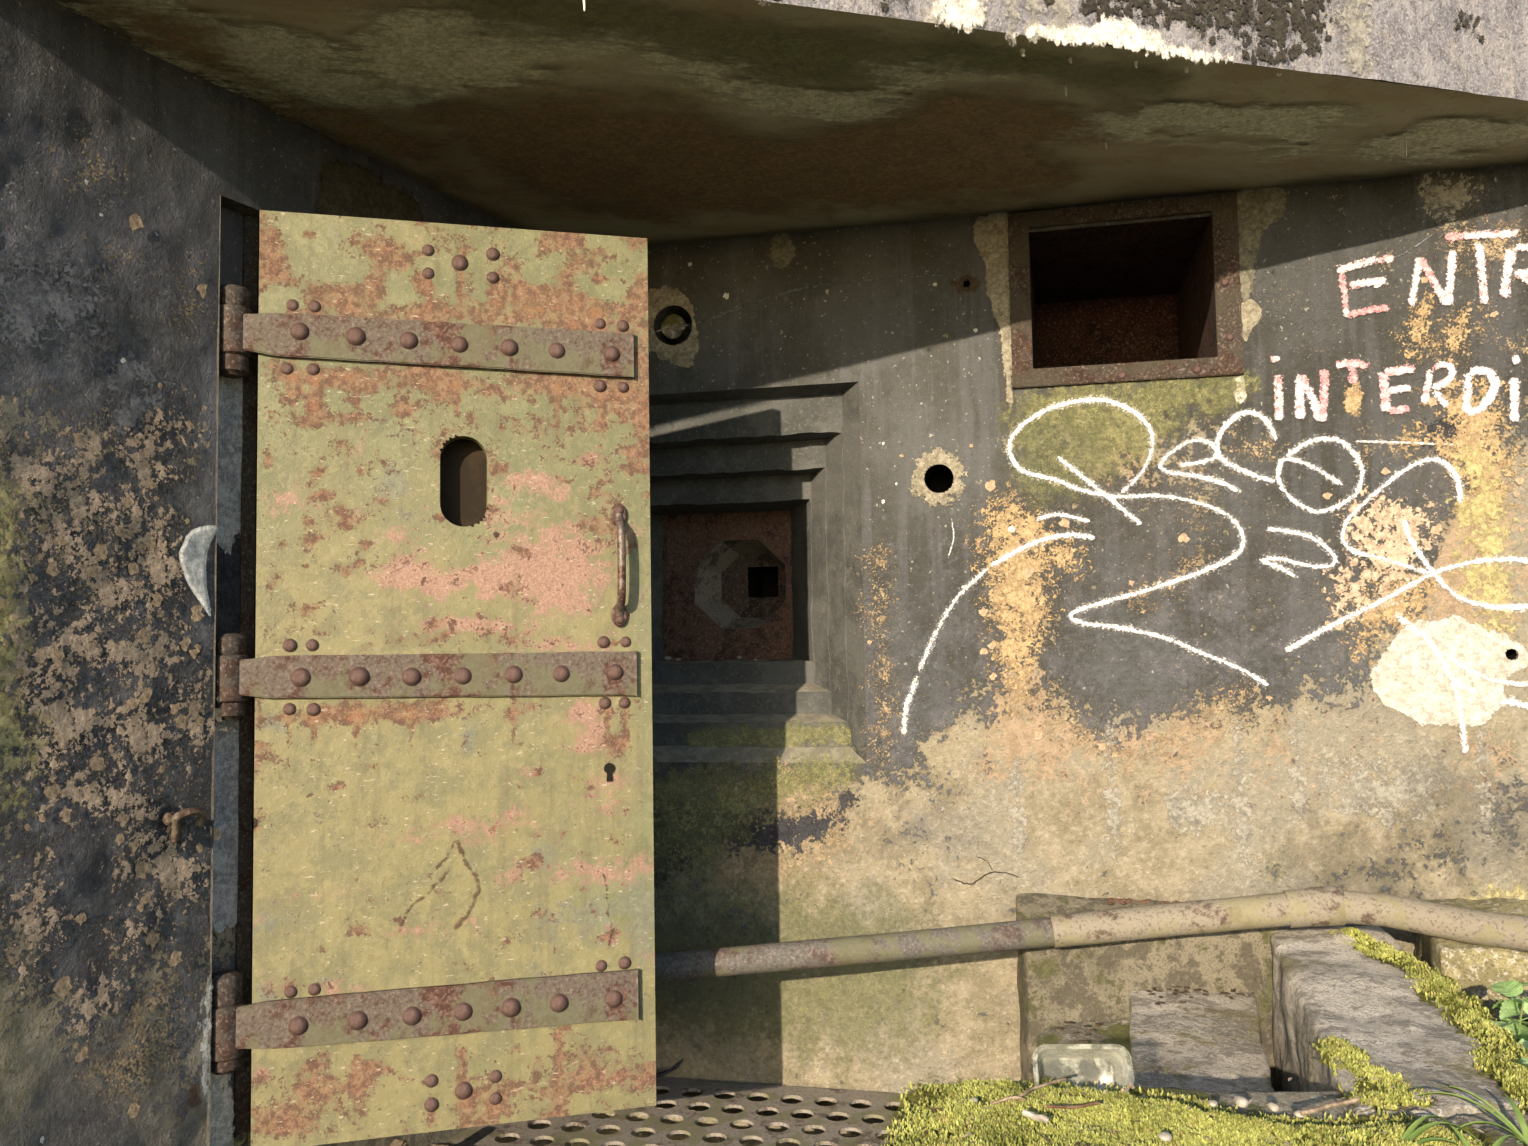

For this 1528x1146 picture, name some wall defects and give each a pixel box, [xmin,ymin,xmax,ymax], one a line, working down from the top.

leakage [63,0,1022,125]
leakage [932,0,1234,64]
leakage [1333,0,1379,76]
leakage [1061,102,1528,225]
spalling [648,285,699,368]
peeling [1312,276,1528,679]
peeling [895,444,1272,782]
spalling [0,374,243,1128]